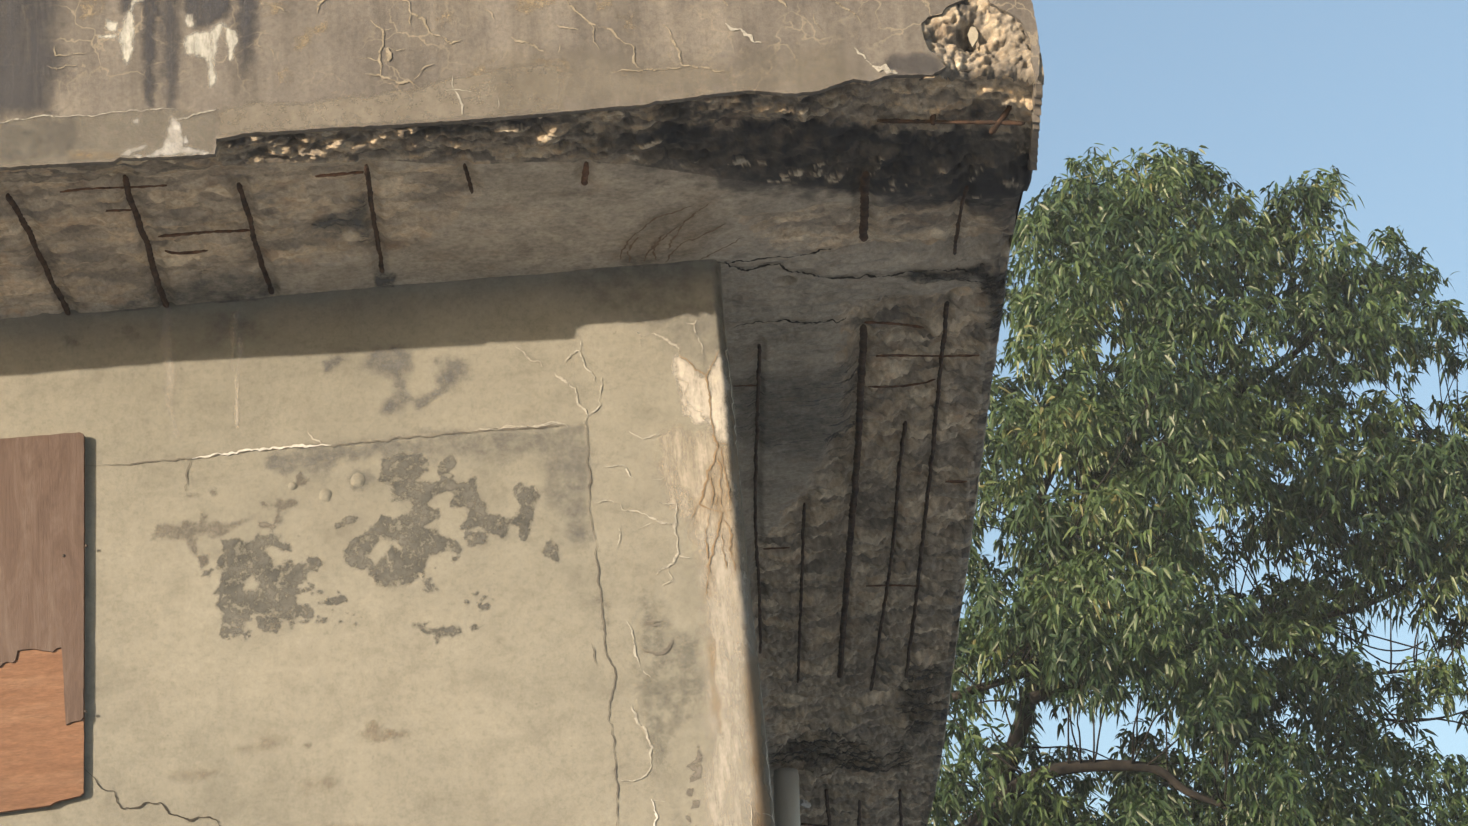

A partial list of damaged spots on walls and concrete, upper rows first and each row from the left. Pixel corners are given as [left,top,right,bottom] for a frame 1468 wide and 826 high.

damp [0,0,75,160]
damp [99,0,257,157]
crack [718,249,990,283]
spalling [0,0,1044,826]
crack [88,318,846,826]